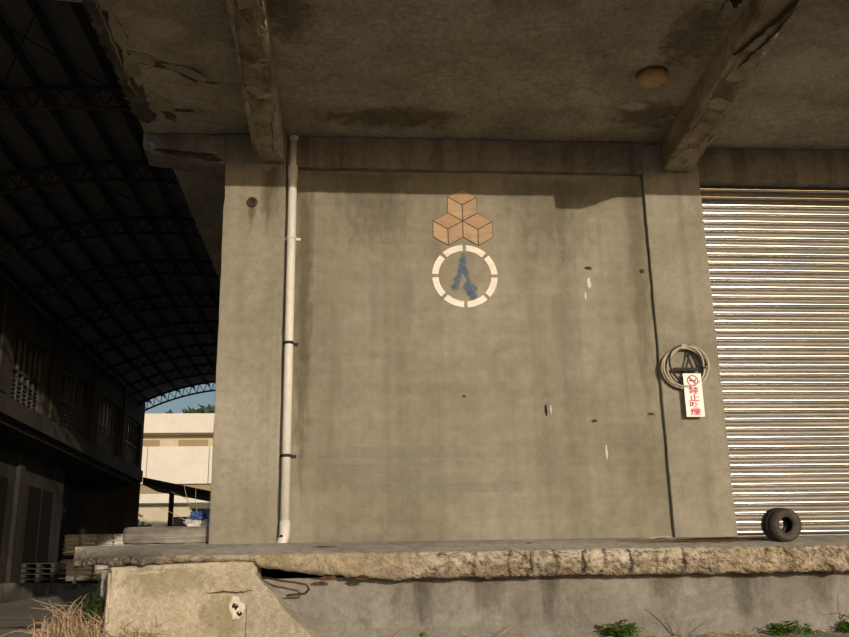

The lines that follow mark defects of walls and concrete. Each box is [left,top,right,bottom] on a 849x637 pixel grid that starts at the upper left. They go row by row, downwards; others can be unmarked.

spalling [82,0,156,123]
spalling [679,0,799,165]